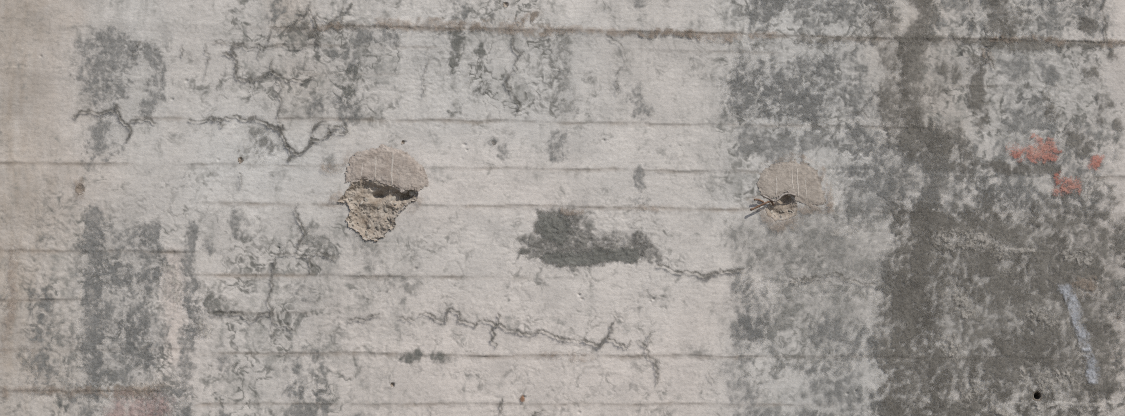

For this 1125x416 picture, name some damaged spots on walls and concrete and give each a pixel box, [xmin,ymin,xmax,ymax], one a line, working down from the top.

damp [639,28,699,38]
crack [182,4,352,161]
crack [74,104,156,141]
spalling [337,140,429,241]
spalling [750,158,826,221]
damp [729,0,1125,416]
crack [350,308,659,382]